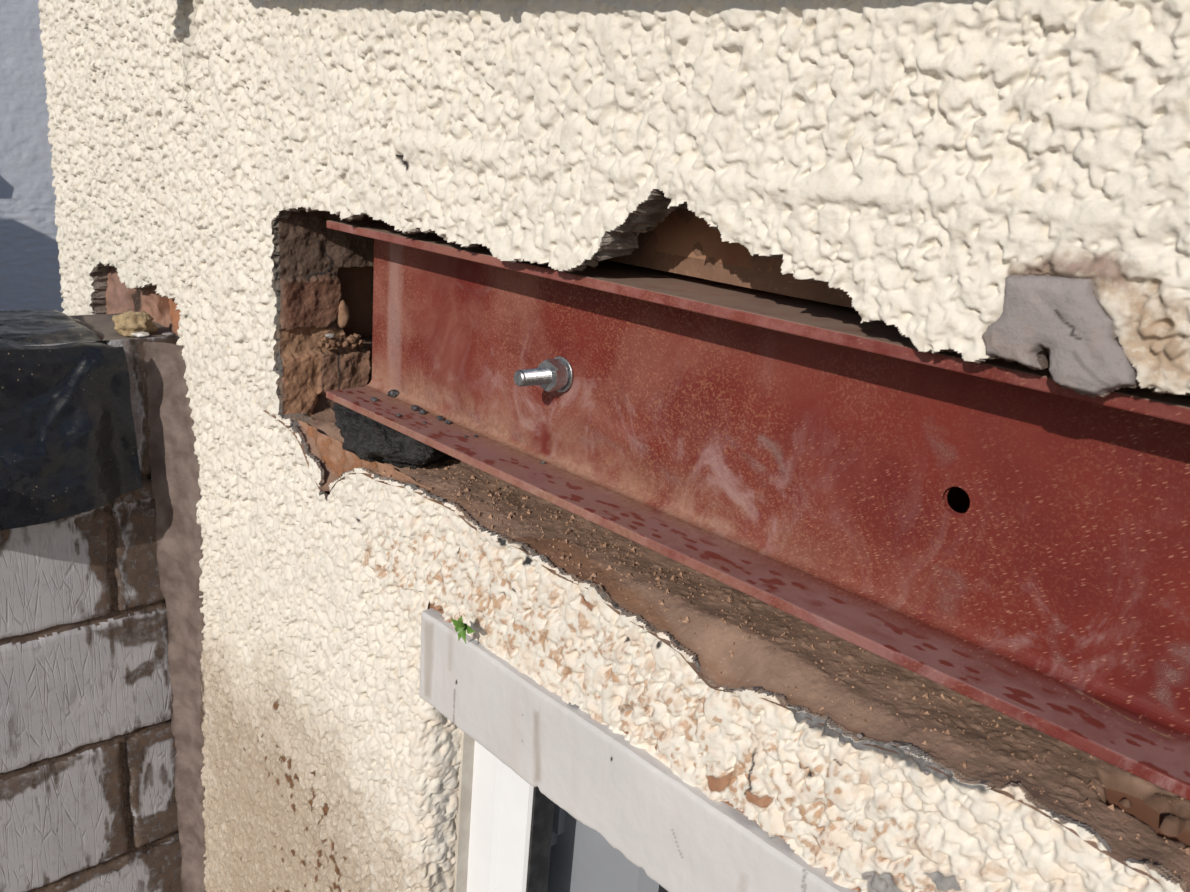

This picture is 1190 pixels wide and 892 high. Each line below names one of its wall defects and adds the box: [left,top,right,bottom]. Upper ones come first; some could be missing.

flaking render [562,189,718,272]
flaking render [89,262,181,337]
flaking render [271,207,1190,892]